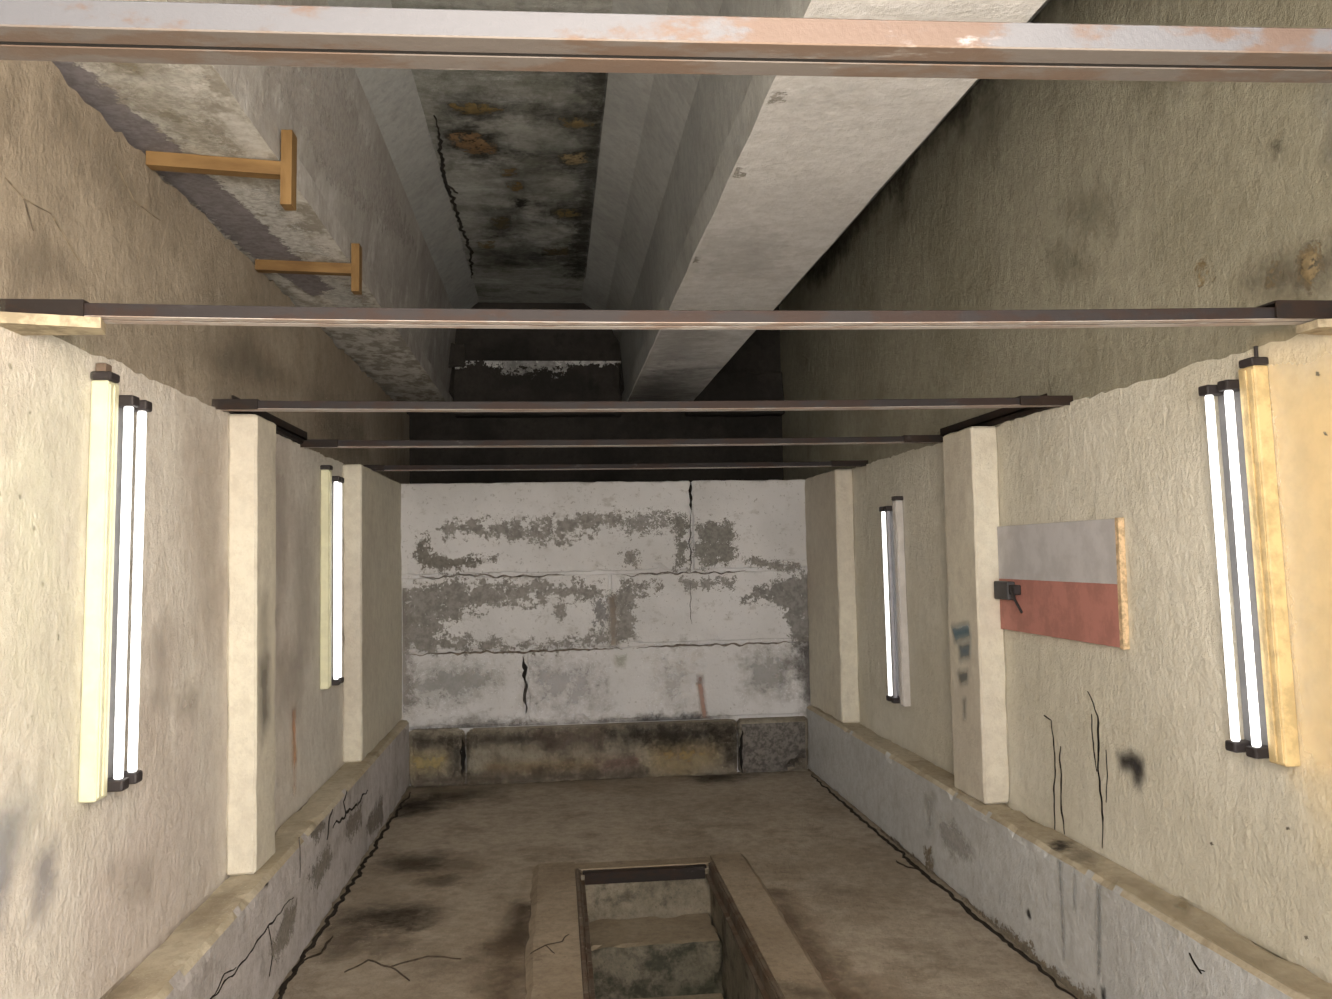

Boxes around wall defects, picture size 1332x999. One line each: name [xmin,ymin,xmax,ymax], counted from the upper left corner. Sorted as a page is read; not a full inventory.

crack [433,115,474,279]
damp [442,72,608,277]
damp [805,82,980,285]
crack [409,482,796,713]
peeling [402,507,809,703]
damp [1119,753,1143,785]
crack [210,790,461,999]
crack [530,934,569,954]